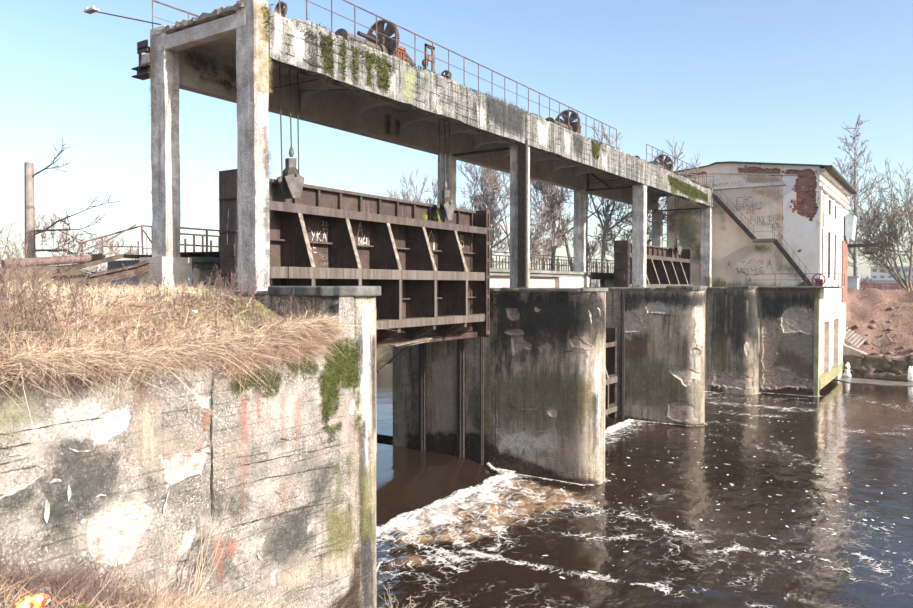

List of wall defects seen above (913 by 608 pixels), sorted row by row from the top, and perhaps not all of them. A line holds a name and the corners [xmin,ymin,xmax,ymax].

flaking render [737,164,819,221]
peeling [0,462,42,499]
damp [5,380,156,538]
peeling [88,404,130,444]
spalling [159,441,209,488]
crack [184,370,357,600]
damp [270,303,377,608]
damp [406,291,605,485]
spalling [669,366,701,387]
peeling [689,306,704,357]
damp [625,279,814,396]
peeling [710,308,814,391]